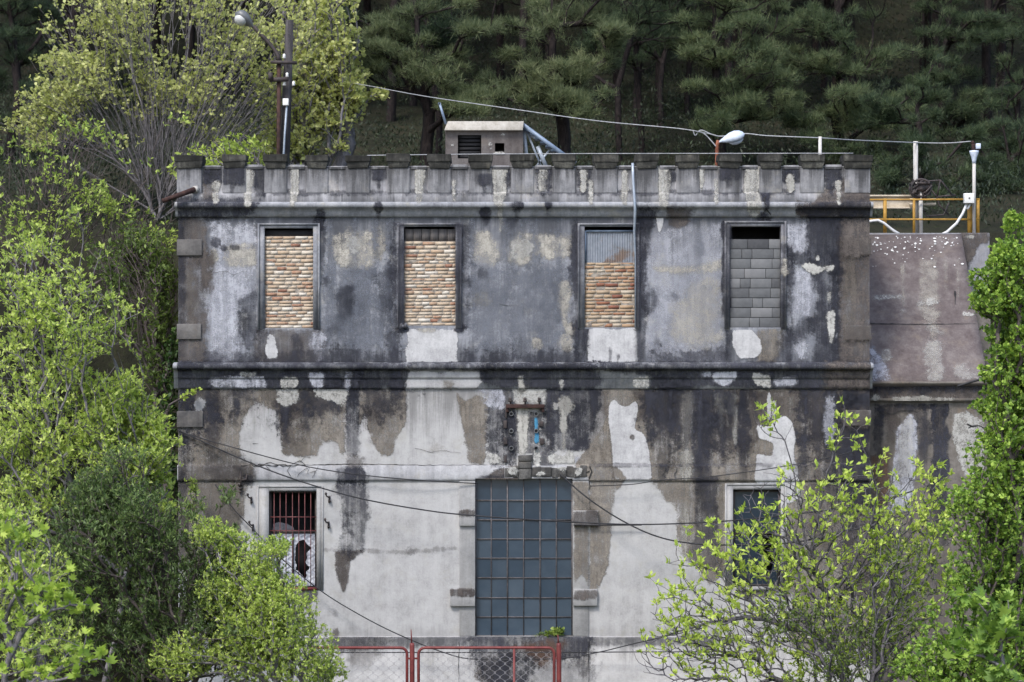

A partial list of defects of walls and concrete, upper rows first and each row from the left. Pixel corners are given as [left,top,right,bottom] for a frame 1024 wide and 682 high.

peeling [802,256,834,275]
peeling [826,293,835,343]
peeling [265,334,278,359]
peeling [404,328,483,391]
peeling [587,328,638,362]
peeling [732,330,762,359]
peeling [633,377,649,389]
peeling [704,371,737,386]
water stain [176,167,991,649]
peeling [608,400,652,480]
peeling [752,373,800,503]